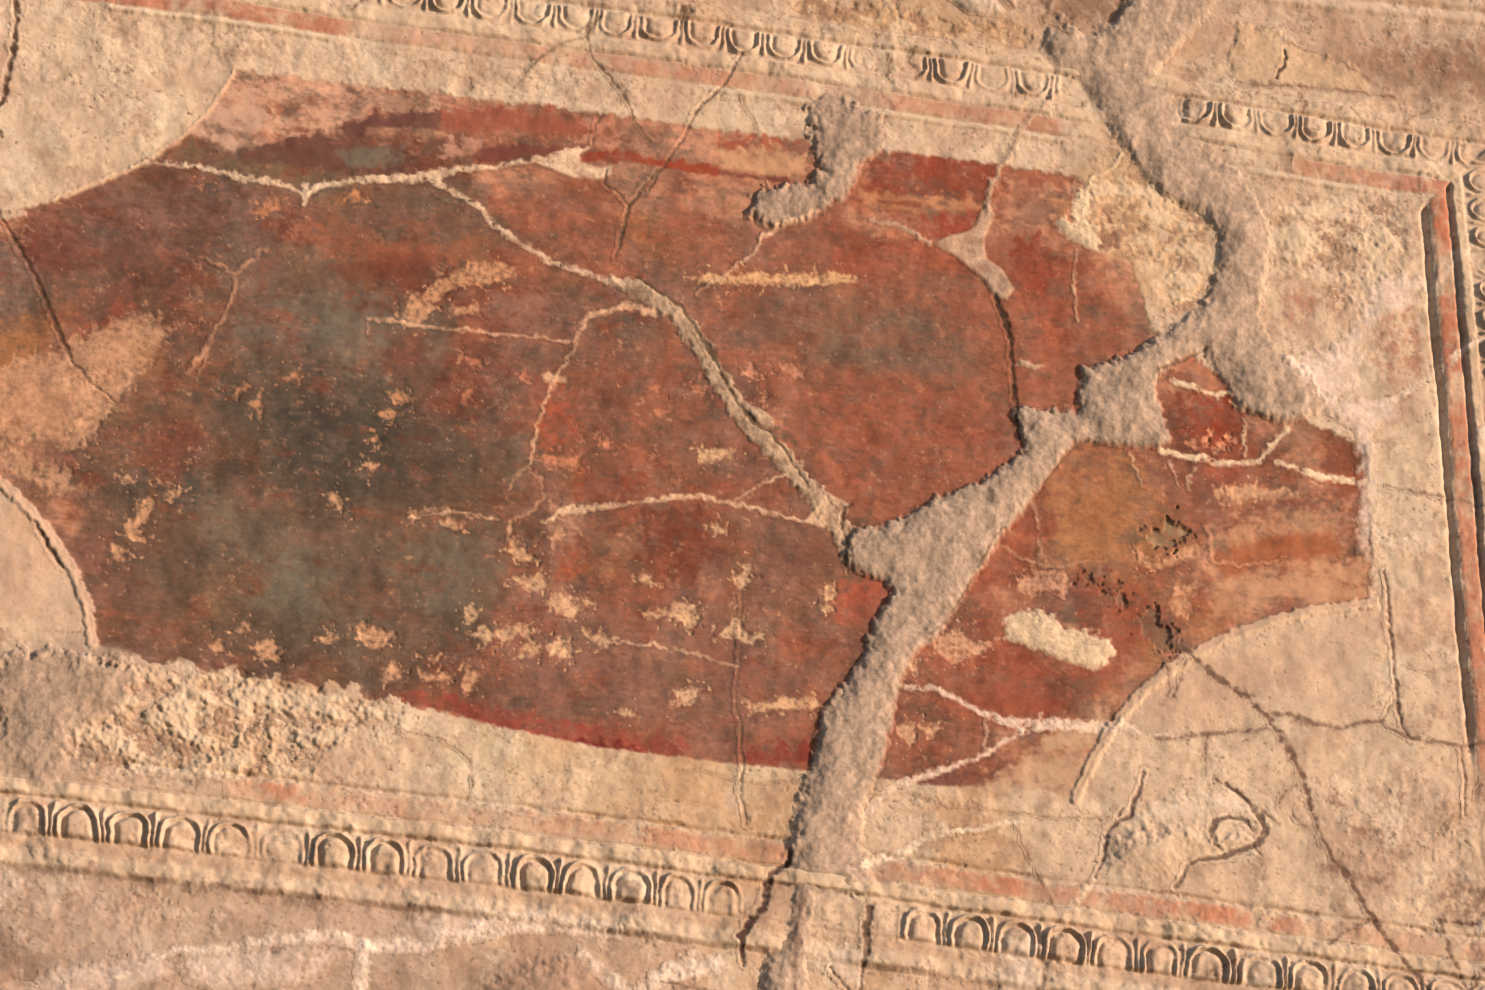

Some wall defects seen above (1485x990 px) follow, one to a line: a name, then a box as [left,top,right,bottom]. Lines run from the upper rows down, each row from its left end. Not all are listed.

crack [0,0,25,143]
crack [1237,23,1431,126]
crack [0,204,121,405]
crack [129,13,857,579]
peeling [681,257,872,299]
crack [867,75,1088,442]
spalling [1054,156,1218,322]
spalling [70,423,632,785]
peeling [630,510,774,660]
peeling [740,684,825,723]
crack [98,333,1485,990]
flaking render [1007,505,1208,665]